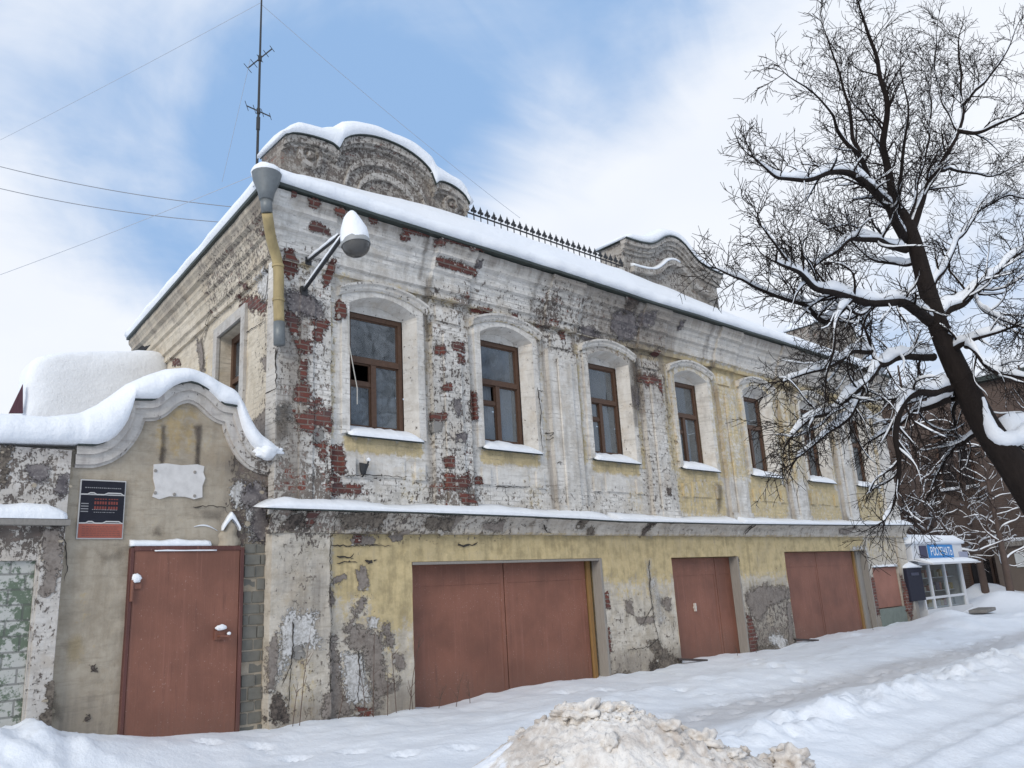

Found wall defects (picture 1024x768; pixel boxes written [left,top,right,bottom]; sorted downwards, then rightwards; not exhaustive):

flaking render [400,227,484,279]
flaking render [279,247,364,498]
flaking render [0,444,73,499]
flaking render [424,381,484,536]
flaking render [36,526,64,598]
flaking render [260,565,406,726]
flaking render [745,581,795,652]
flaking render [33,680,55,726]